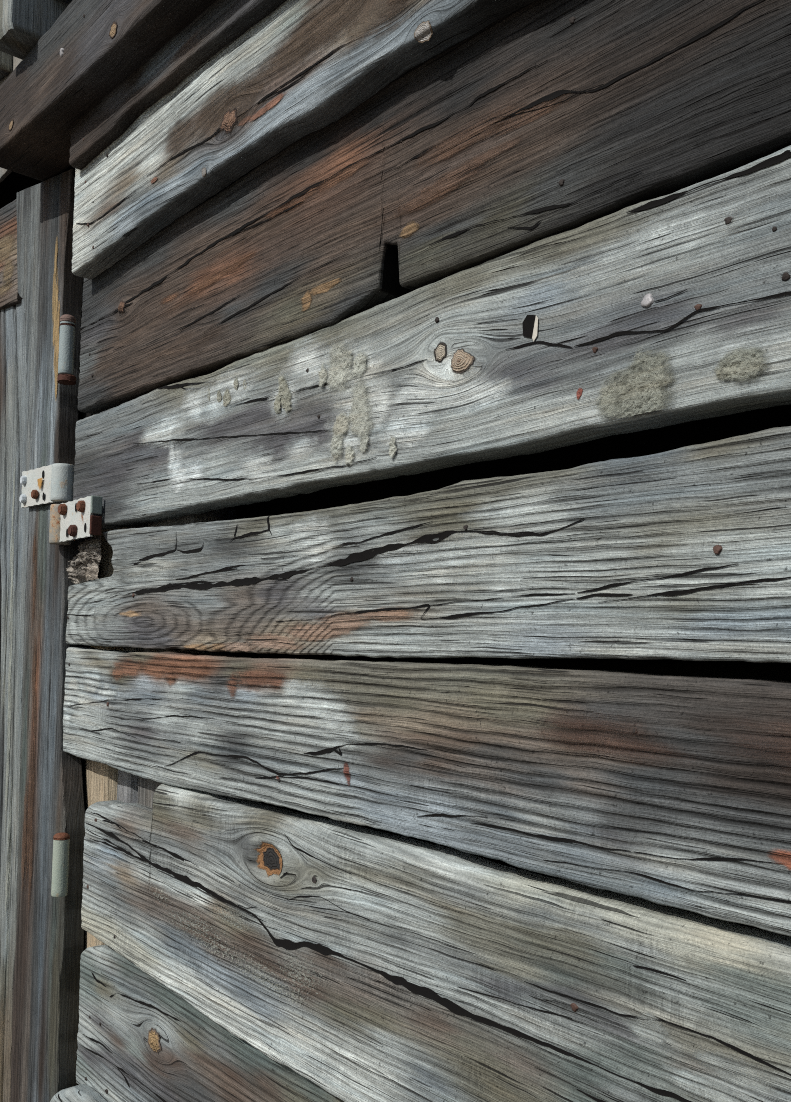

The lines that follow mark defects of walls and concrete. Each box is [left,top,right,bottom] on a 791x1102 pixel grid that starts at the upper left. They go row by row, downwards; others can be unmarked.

crack [66,516,584,616]
crack [276,564,791,622]
corrosion [770,850,791,869]
crack [81,812,791,1102]